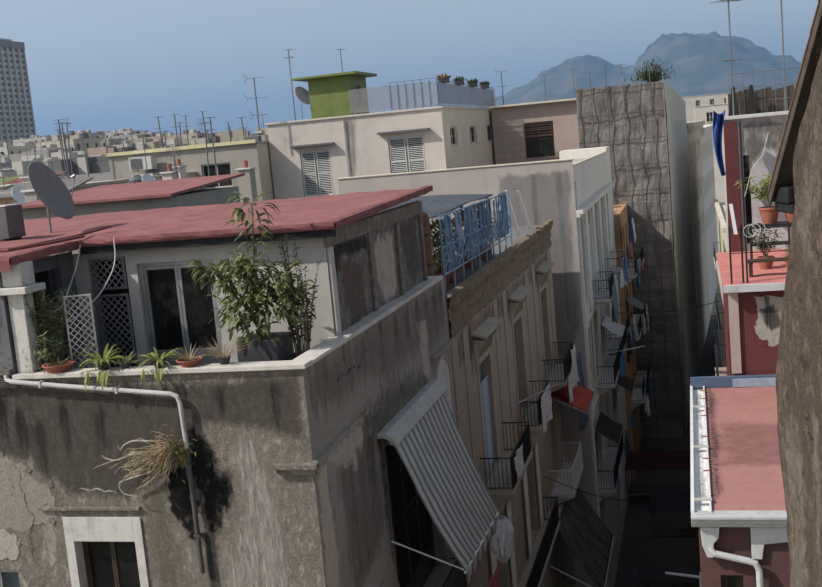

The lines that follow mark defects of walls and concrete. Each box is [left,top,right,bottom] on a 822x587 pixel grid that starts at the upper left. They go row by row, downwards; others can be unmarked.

damp [333,236,366,271]
peeling [747,292,784,347]
peeling [0,451,56,560]
damp [43,523,57,567]
damp [0,377,300,543]
damp [223,438,288,587]